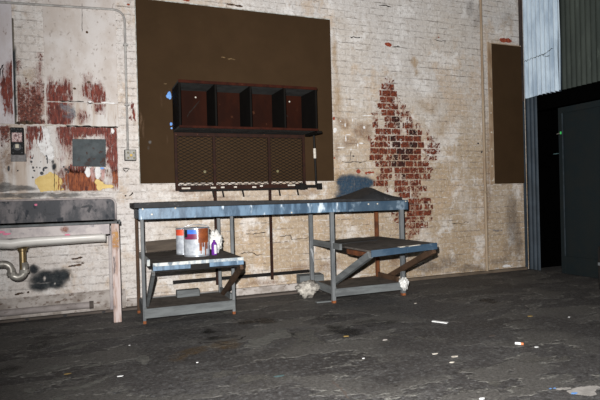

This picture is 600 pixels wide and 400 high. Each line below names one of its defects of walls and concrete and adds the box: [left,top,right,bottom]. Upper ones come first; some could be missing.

peeling [333,78,440,240]